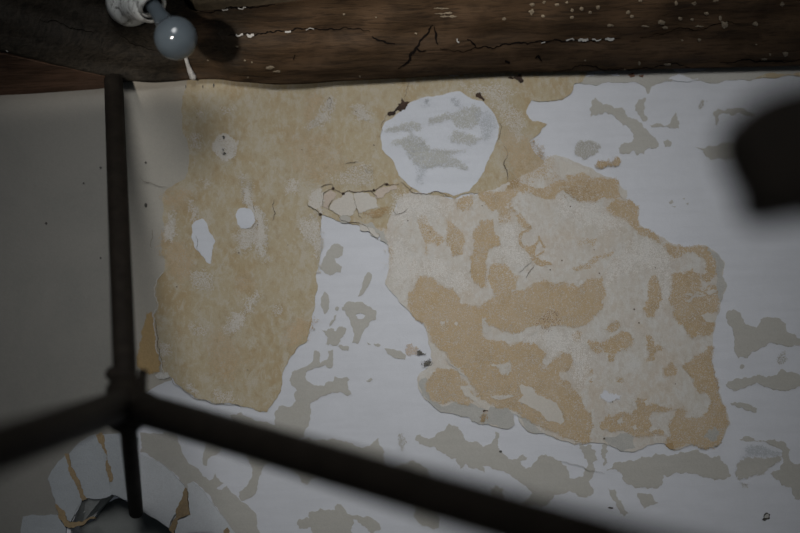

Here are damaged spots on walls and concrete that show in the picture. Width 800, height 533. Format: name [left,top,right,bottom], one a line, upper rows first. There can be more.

crack [228,25,620,69]
crack [307,182,446,235]
flaking render [153,66,800,509]